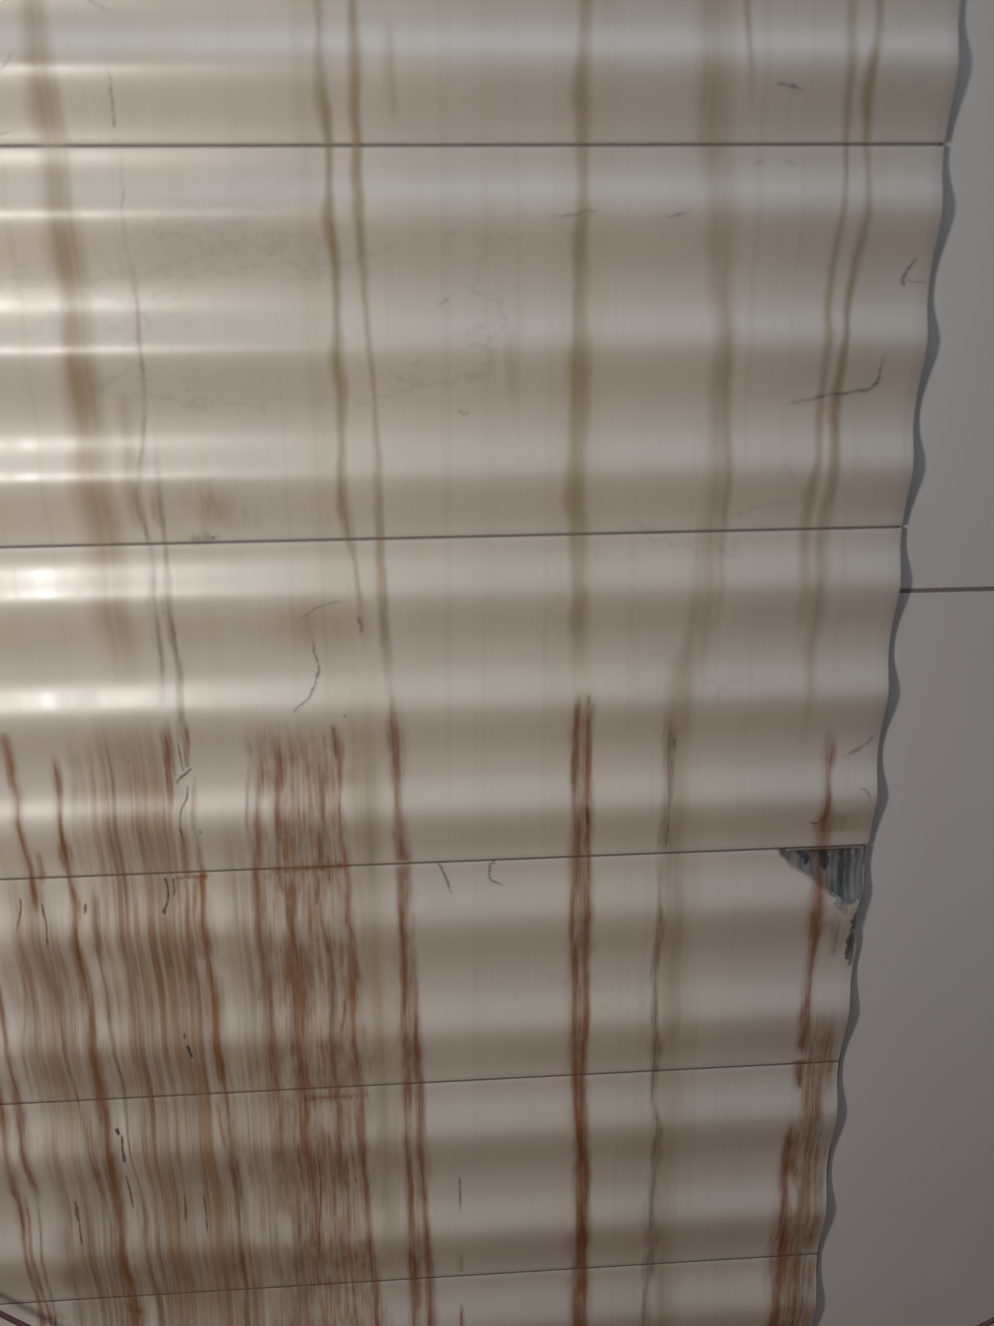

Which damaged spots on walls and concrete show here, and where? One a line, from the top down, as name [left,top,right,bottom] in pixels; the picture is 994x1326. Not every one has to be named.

corrosion [164,738,190,832]
corrosion [59,812,67,859]
corrosion [72,888,99,980]
corrosion [187,874,206,954]
spalling [777,845,867,959]
corrosion [275,754,367,1326]
corrosion [107,1128,132,1218]
corrosion [772,1042,831,1326]